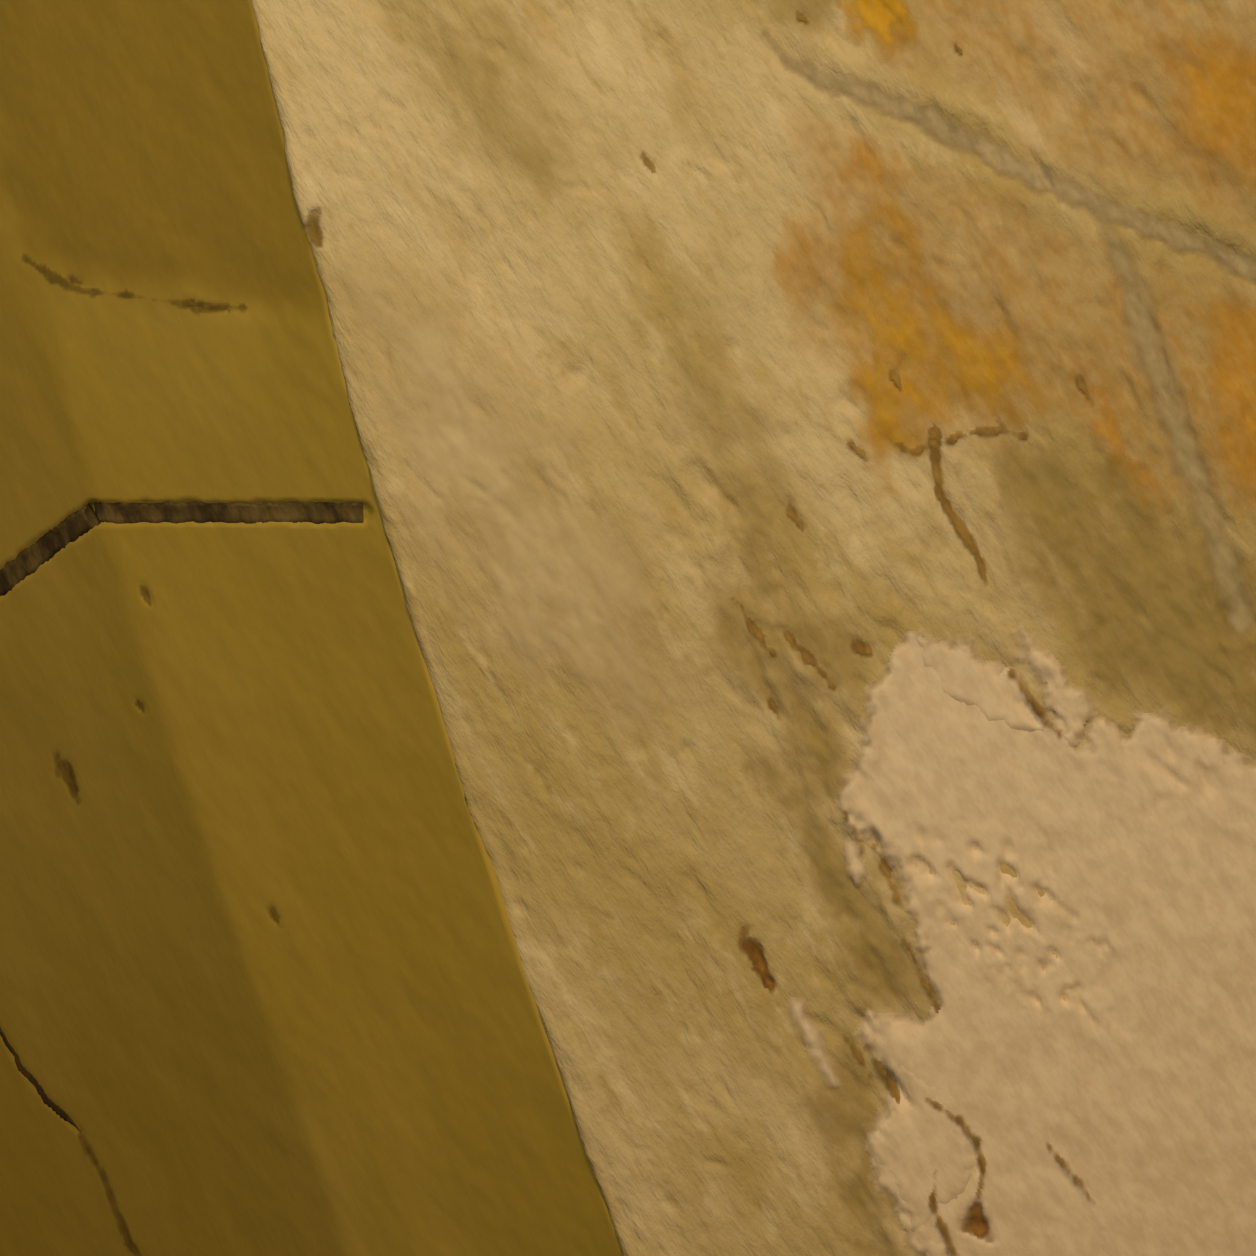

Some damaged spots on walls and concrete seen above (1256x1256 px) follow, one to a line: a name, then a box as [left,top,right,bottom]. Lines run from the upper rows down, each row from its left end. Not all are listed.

rust [845,0,913,44]
crack [0,1026,139,1255]
peeling [789,1000,838,1086]
peeling [840,625,1256,1256]